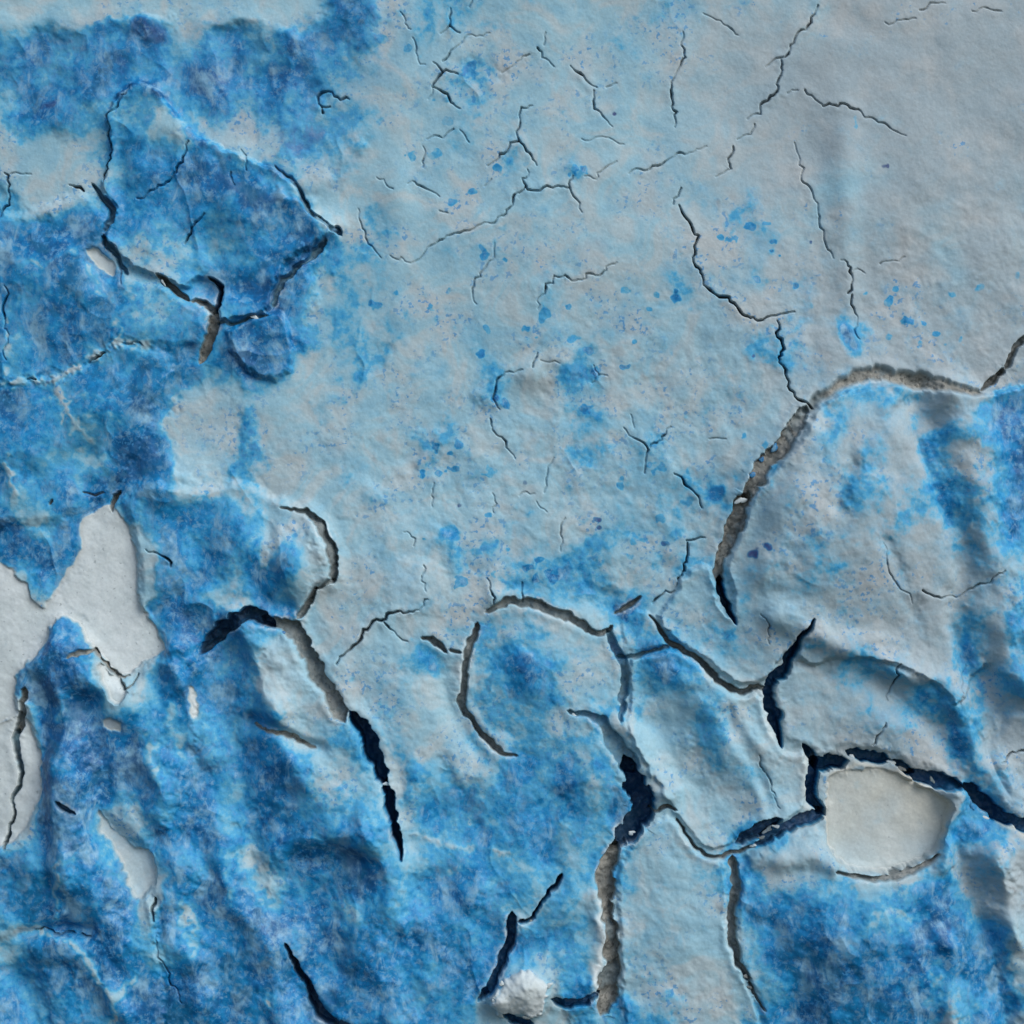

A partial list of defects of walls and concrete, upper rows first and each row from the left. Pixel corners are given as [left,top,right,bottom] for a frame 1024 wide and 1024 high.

crack [69,0,908,368]
crack [884,2,946,26]
crack [972,6,1003,14]
peeling [0,81,808,1024]
crack [196,187,1024,1024]
peeling [824,768,955,875]